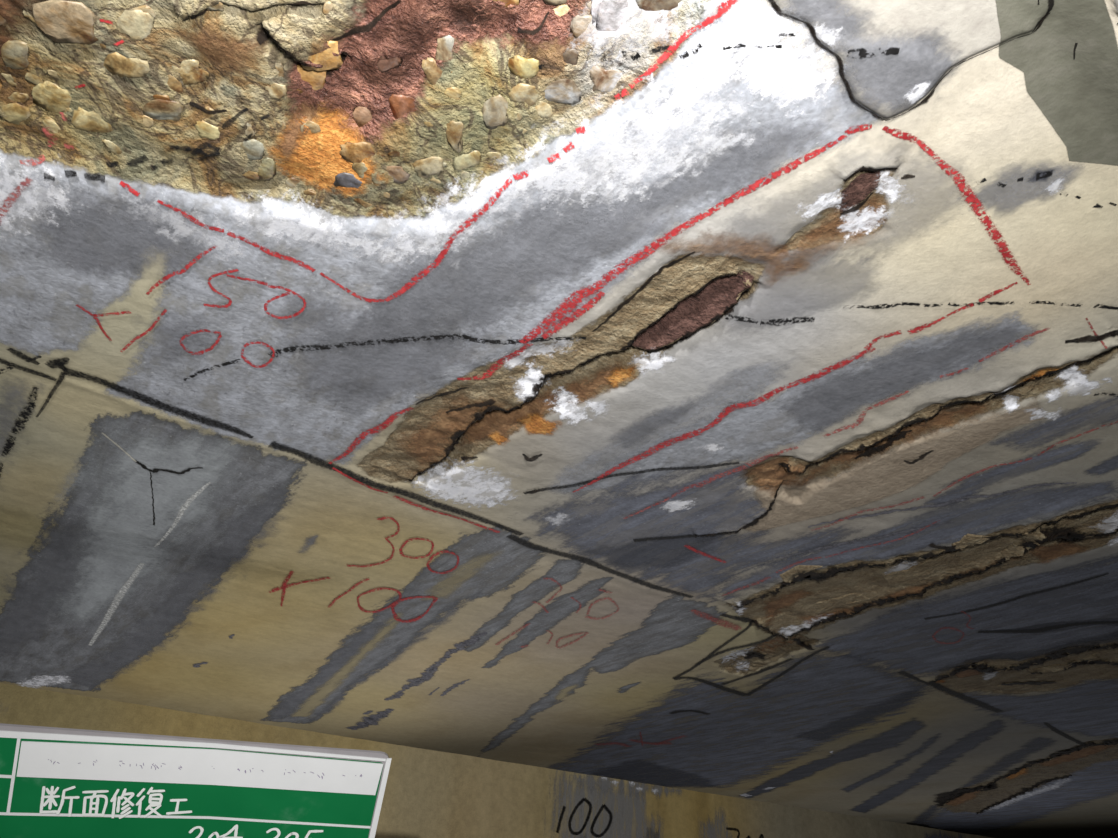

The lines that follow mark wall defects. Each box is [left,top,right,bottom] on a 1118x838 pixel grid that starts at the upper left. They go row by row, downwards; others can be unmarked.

spalling [0,0,711,219]
rust [271,0,585,196]
spalling [783,166,915,251]
crack [1032,0,1054,32]
damp [0,0,880,692]
spalling [357,251,765,507]
spalling [694,330,1118,538]
spalling [715,500,1118,674]
damp [550,556,1118,838]
spalling [934,738,1118,814]